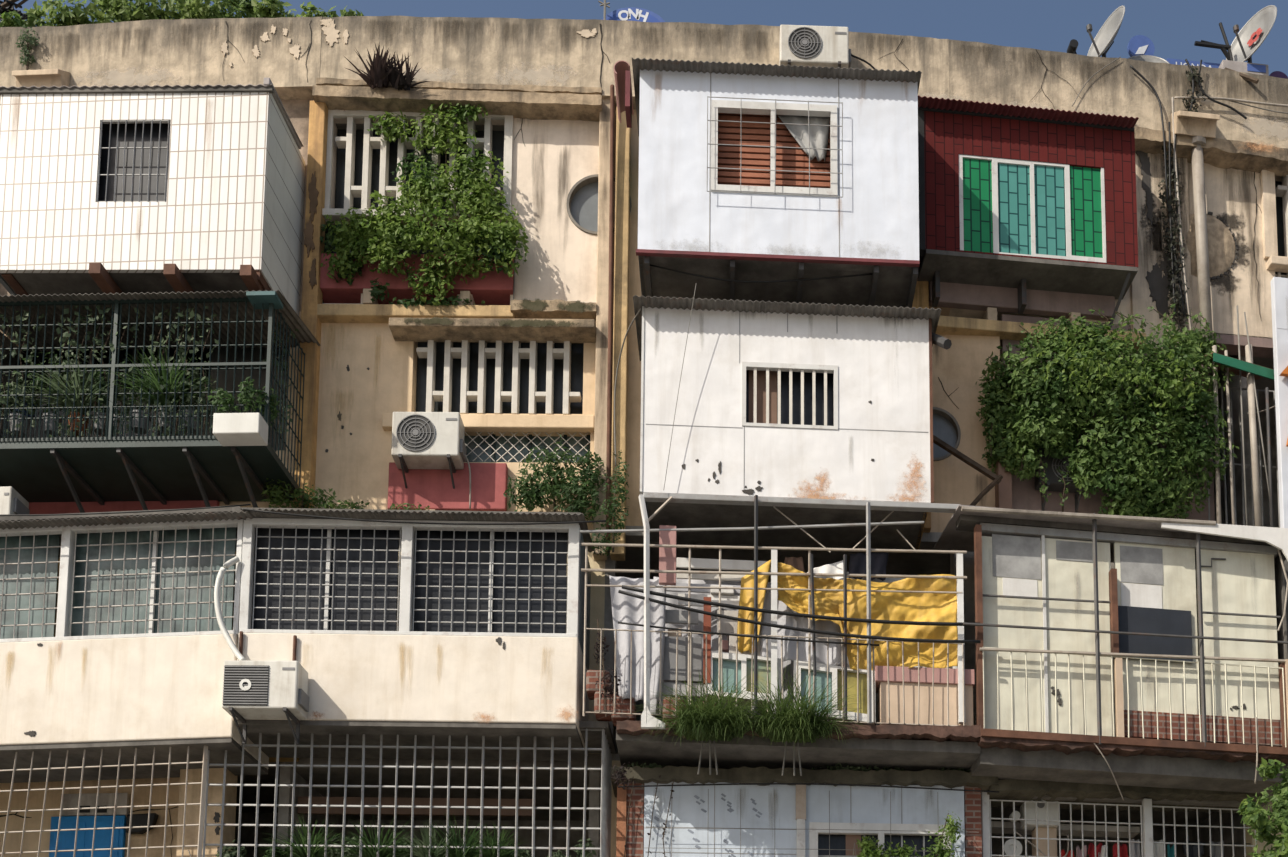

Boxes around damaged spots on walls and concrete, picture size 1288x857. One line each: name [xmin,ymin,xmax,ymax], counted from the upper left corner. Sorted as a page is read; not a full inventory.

peeling [252,25,301,59]
peeling [320,18,349,47]
leakage [404,69,455,81]
crack [1035,49,1078,109]
leakage [1141,158,1191,333]
leakage [1210,170,1259,292]